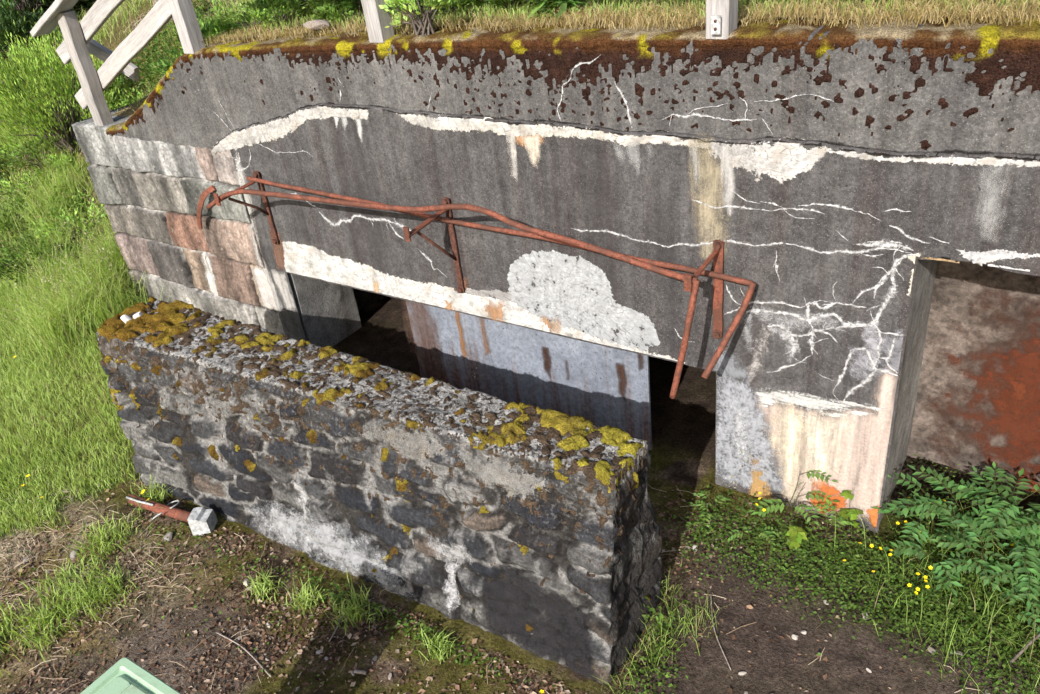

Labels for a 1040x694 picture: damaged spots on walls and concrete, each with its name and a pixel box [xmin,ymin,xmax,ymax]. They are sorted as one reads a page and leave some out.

spalling [212,106,369,153]
water stain [334,117,362,139]
crack [190,56,1040,184]
spalling [396,113,1040,184]
crack [291,193,443,274]
peeling [282,241,685,364]
corrosion [480,304,503,354]
corrosion [542,347,551,376]
corrosion [616,364,626,399]
crack [571,190,946,402]
water stain [715,313,903,517]
corrosion [810,477,846,514]